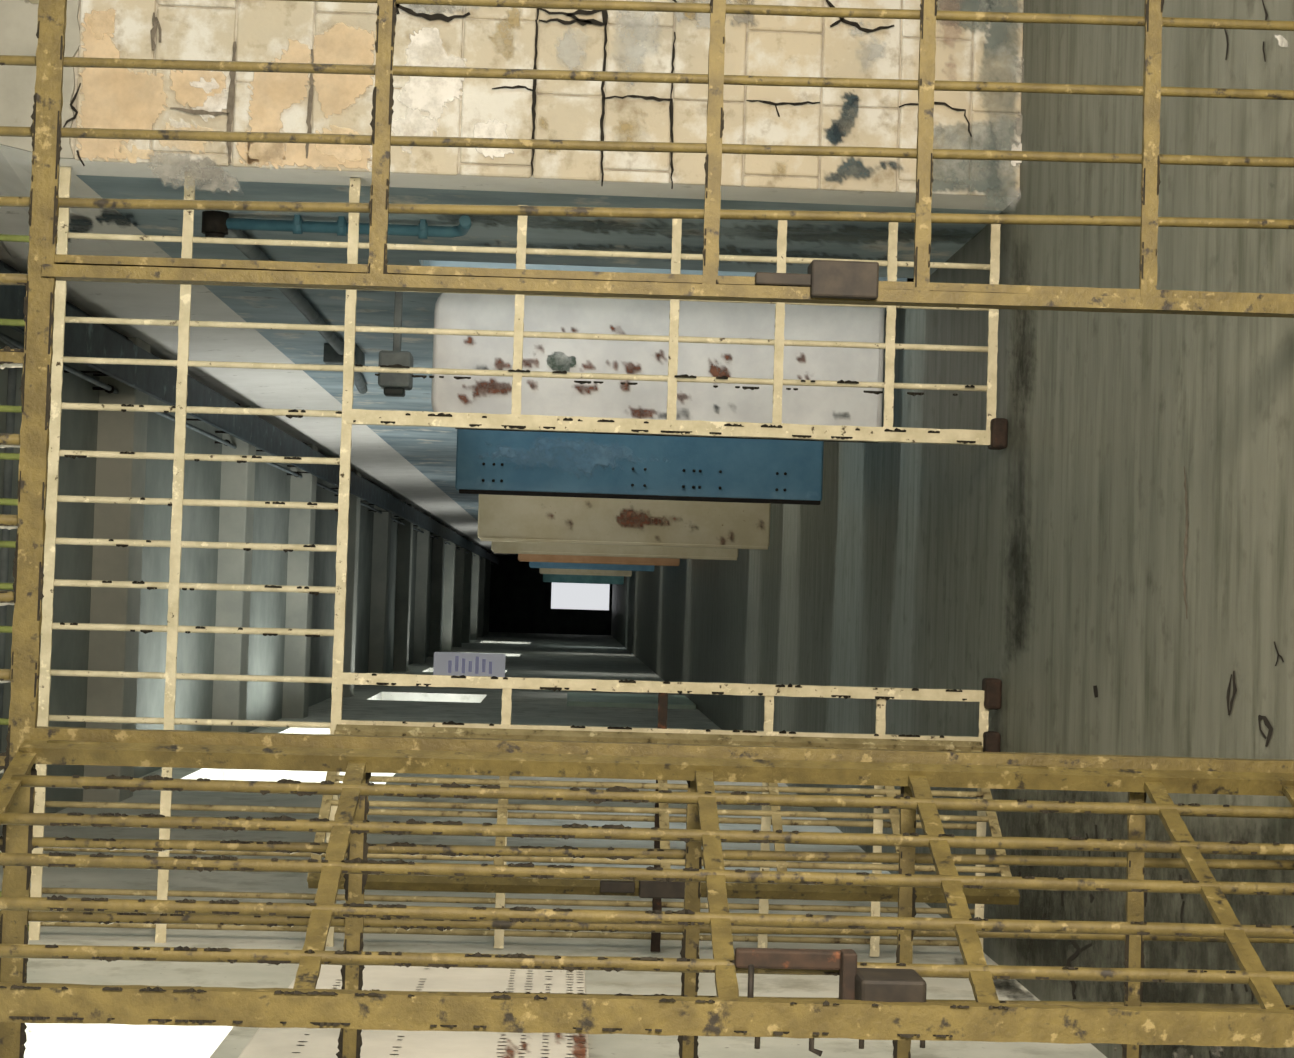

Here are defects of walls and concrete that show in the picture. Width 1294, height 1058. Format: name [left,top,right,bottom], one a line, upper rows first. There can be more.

crack [396,4,471,22]
crack [826,0,894,33]
peeling [53,9,238,244]
peeling [236,0,466,171]
crack [492,0,678,189]
water stain [825,93,859,145]
water stain [825,157,901,183]
peeling [45,292,54,430]
rust [458,347,542,403]
rust [582,362,641,390]
rust [709,355,732,377]
peeling [9,1016,84,1058]